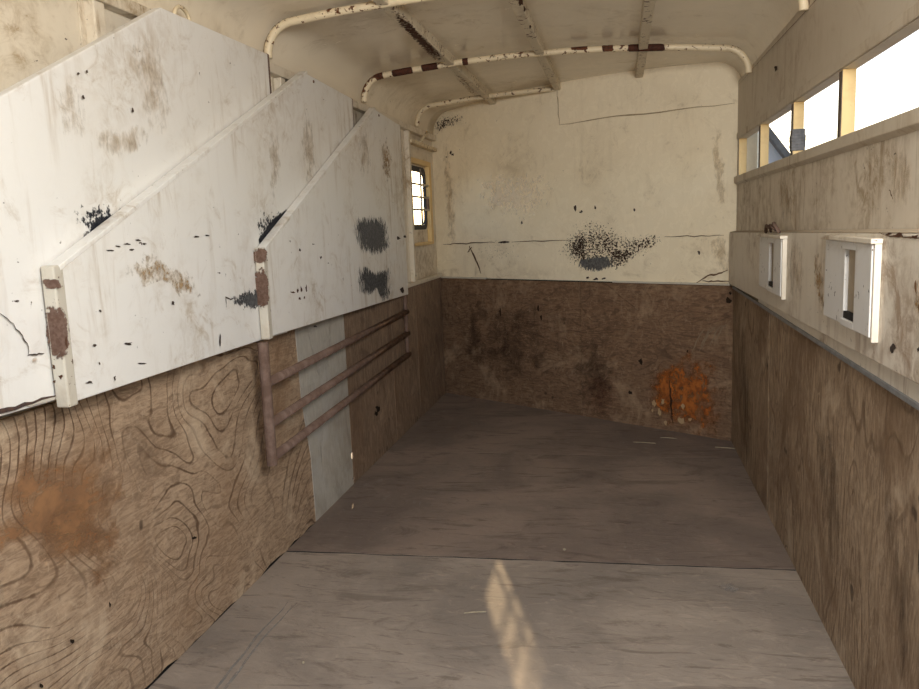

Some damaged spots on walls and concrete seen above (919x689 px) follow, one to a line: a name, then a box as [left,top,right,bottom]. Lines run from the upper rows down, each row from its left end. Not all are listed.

corrosion [43,279,63,289]
corrosion [253,248,269,307]
corrosion [45,306,70,383]
corrosion [651,355,717,428]